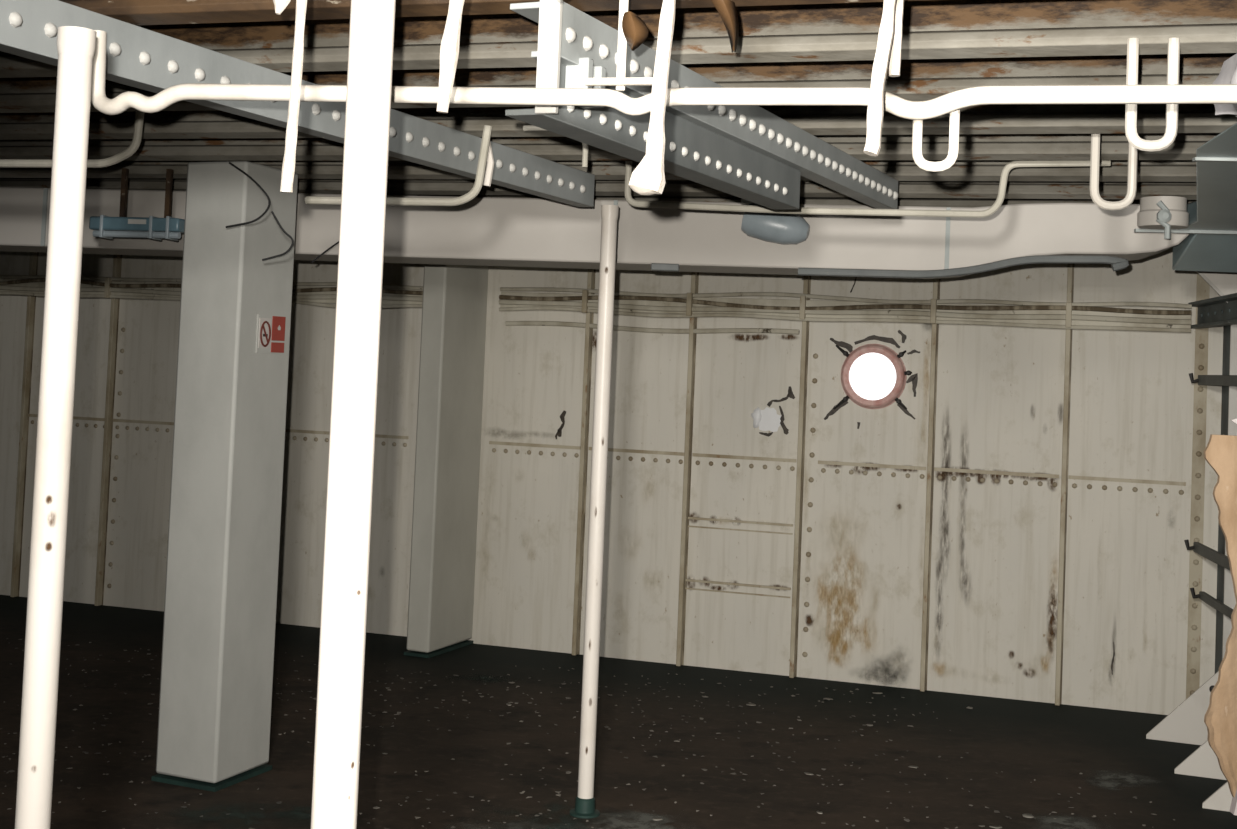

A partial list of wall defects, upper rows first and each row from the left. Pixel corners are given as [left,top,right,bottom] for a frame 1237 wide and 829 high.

peeling [751,386,795,437]